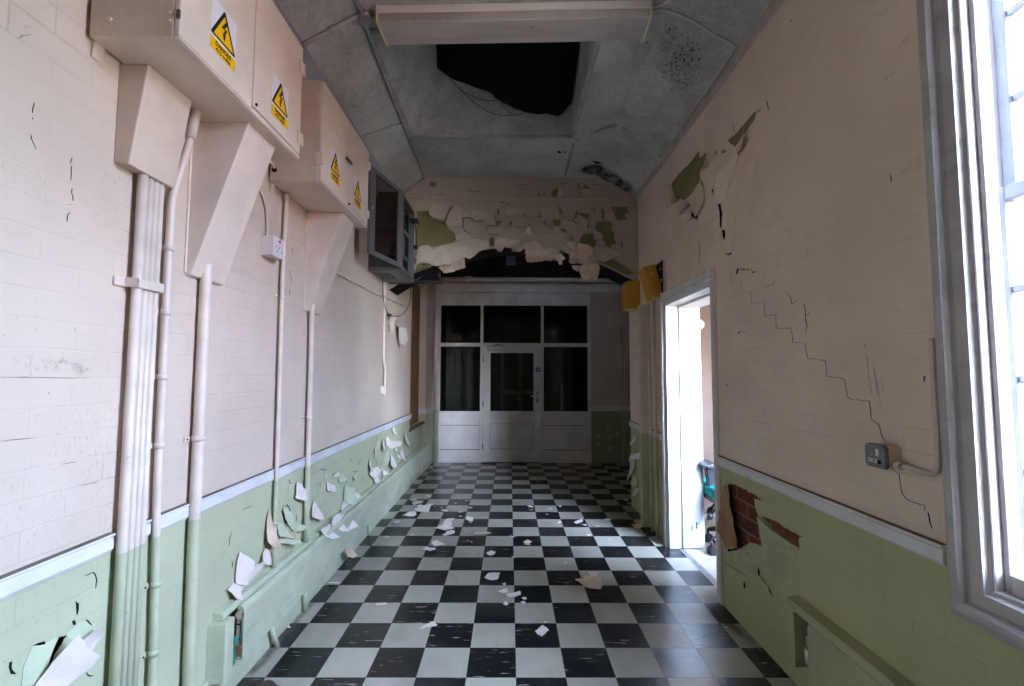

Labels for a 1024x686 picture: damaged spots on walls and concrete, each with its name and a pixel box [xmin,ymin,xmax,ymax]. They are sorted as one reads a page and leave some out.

peeling [416,203,463,247]
peeling [559,206,634,275]
crack [741,279,885,442]
peeling [369,427,410,483]
peeling [228,471,361,601]
spalling [717,484,801,554]
crack [892,469,932,528]
peeling [9,602,104,686]